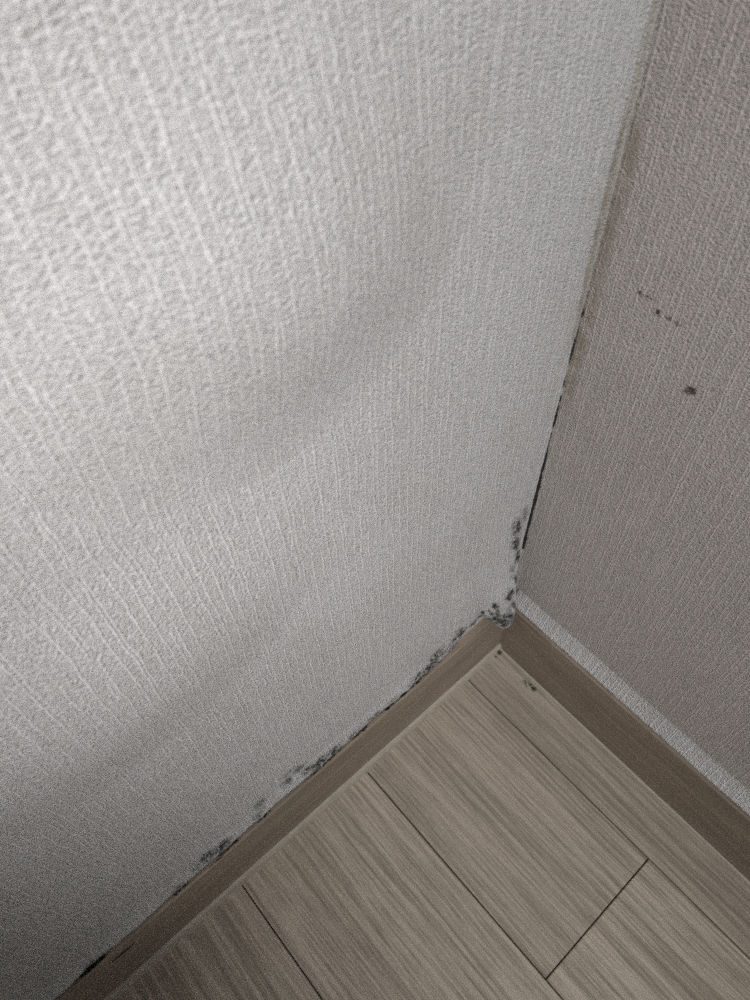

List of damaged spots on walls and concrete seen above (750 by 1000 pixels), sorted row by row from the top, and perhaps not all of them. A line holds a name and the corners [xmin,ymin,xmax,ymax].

damp [349,516,526,739]
damp [283,747,341,784]
damp [193,839,239,870]
damp [78,952,107,978]